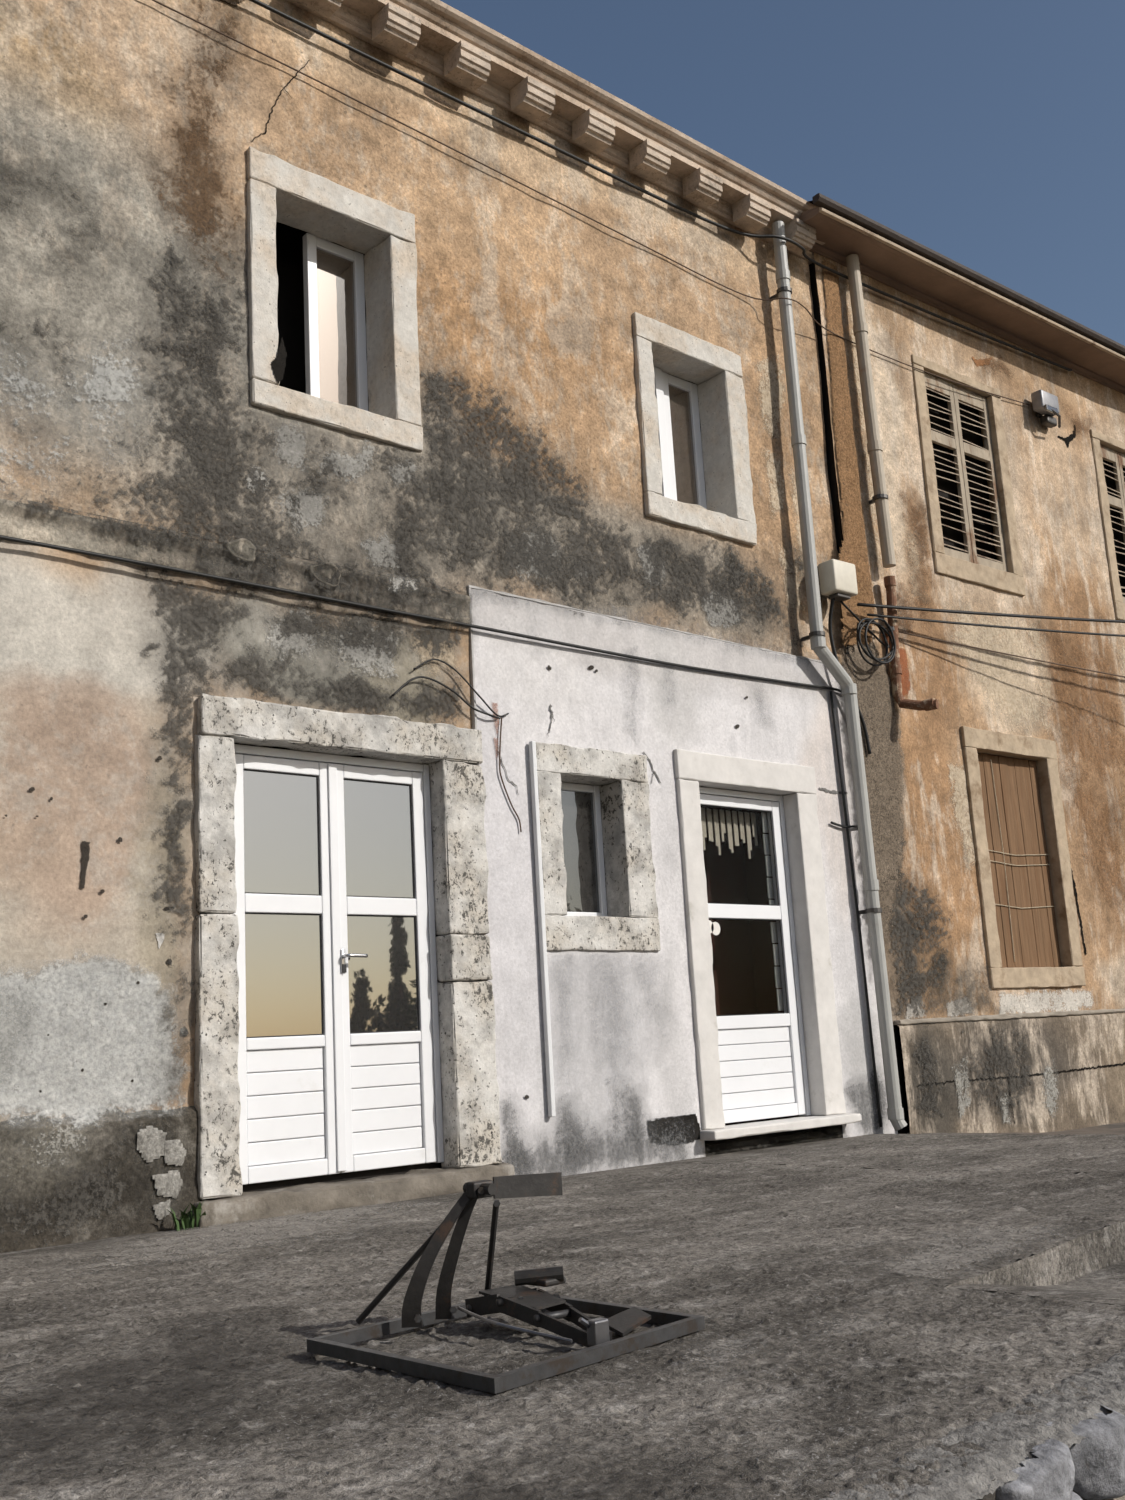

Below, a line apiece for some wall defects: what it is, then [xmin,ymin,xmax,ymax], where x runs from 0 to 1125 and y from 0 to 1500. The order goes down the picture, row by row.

water stain [0,0,805,1253]
corrosion [882,631,911,697]
spalling [156,933,172,965]
water stain [879,832,1059,1123]
water stain [846,1071,887,1133]
spalling [136,1122,186,1220]